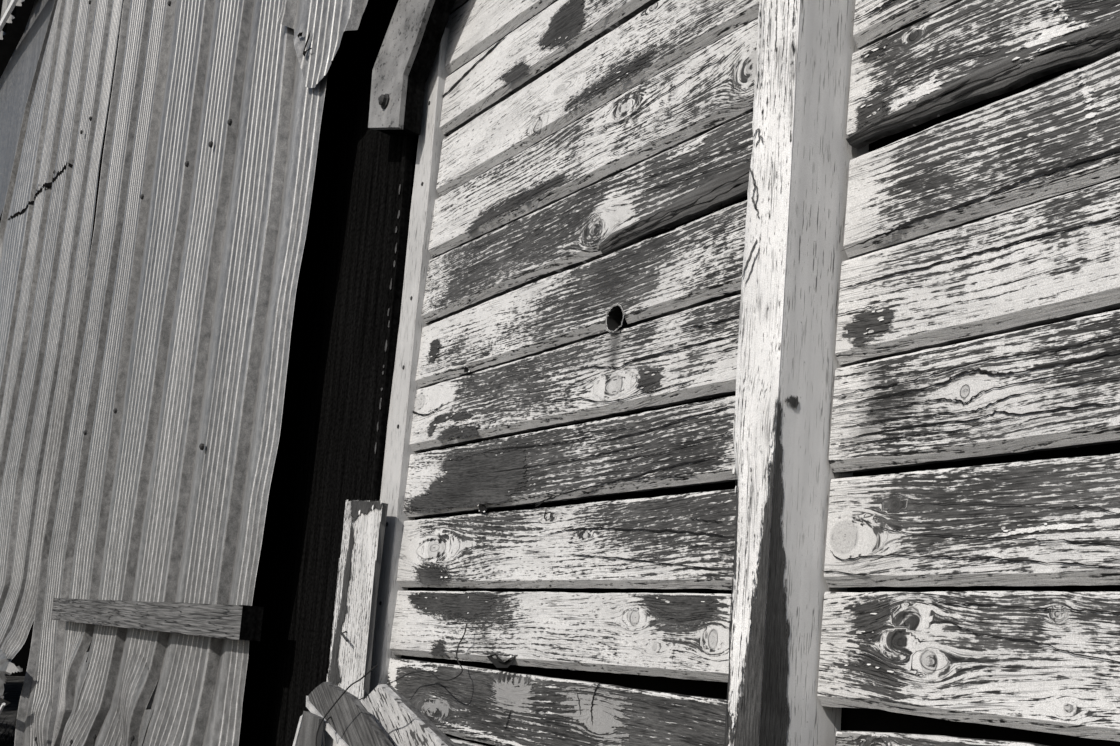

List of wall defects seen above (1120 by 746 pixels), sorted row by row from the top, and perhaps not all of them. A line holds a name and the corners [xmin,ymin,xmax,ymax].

peeling [538,0,607,51]
spalling [846,0,1120,146]
spalling [599,161,760,254]
peeling [840,303,896,349]
peeling [427,411,481,440]
peeling [409,443,529,513]
peeling [992,515,1088,540]
peeling [642,395,790,746]
peeling [388,639,447,690]
peeling [418,692,524,746]
peeling [486,653,542,723]
peeling [554,681,635,746]